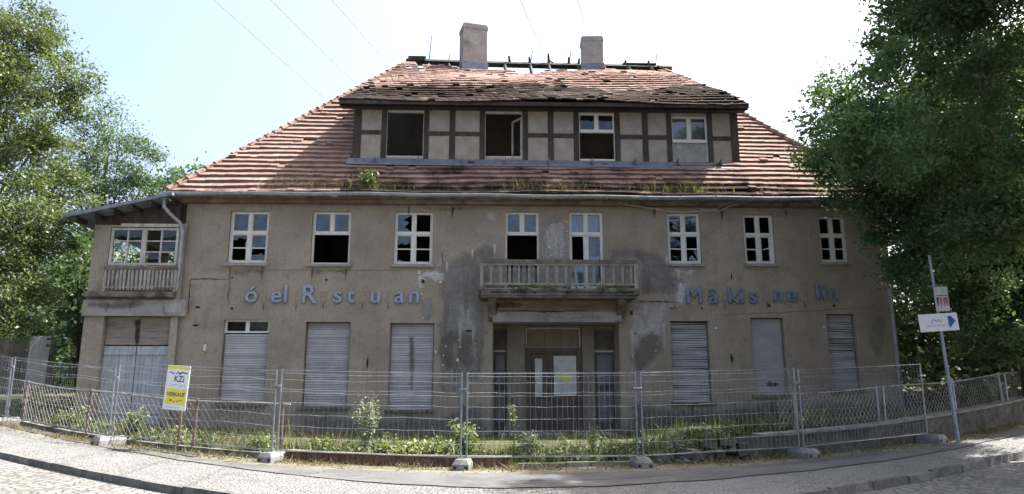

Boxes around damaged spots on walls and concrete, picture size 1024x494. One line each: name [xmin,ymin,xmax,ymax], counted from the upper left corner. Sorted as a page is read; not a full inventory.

peeling [415,269,445,295]
leakage [423,239,500,390]
leakage [614,250,696,378]